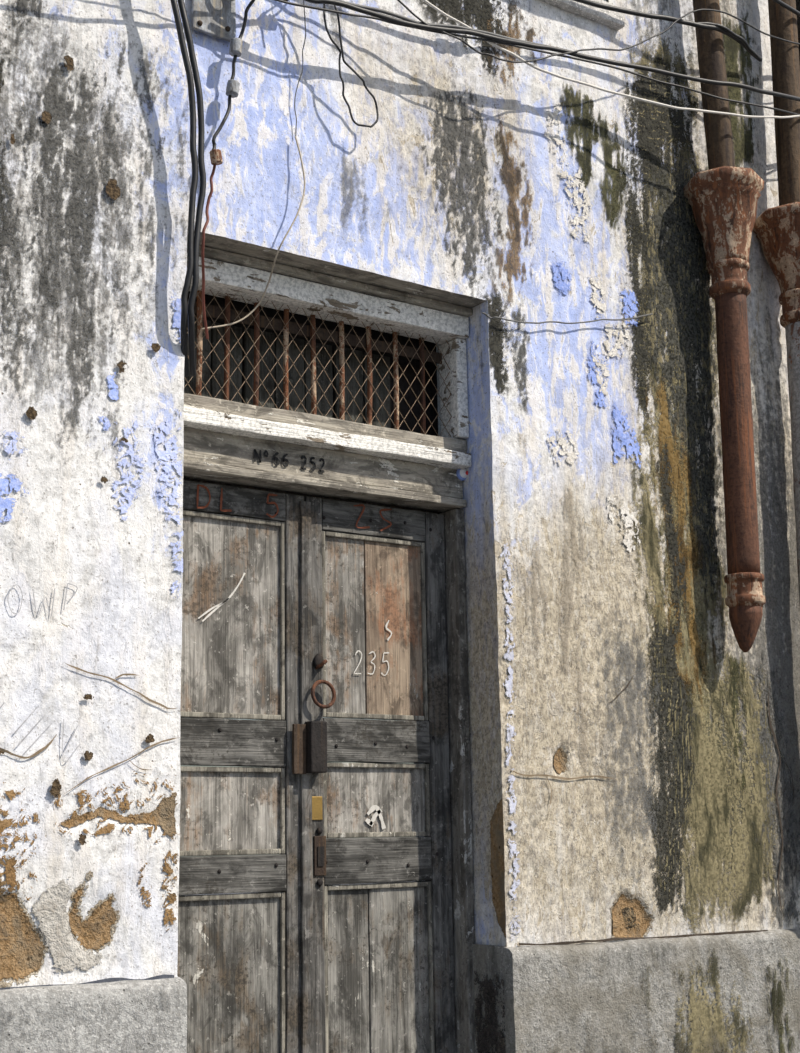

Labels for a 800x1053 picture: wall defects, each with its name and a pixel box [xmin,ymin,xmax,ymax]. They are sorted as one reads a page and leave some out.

damp [417,0,542,83]
damp [0,0,163,435]
damp [417,86,534,412]
spalling [26,406,37,420]
peeling [587,274,642,469]
damp [560,0,800,934]
crack [0,734,57,759]
spalling [49,778,62,798]
spalling [0,782,120,988]
crack [0,974,174,990]
crack [54,737,180,931]
crack [65,663,176,709]